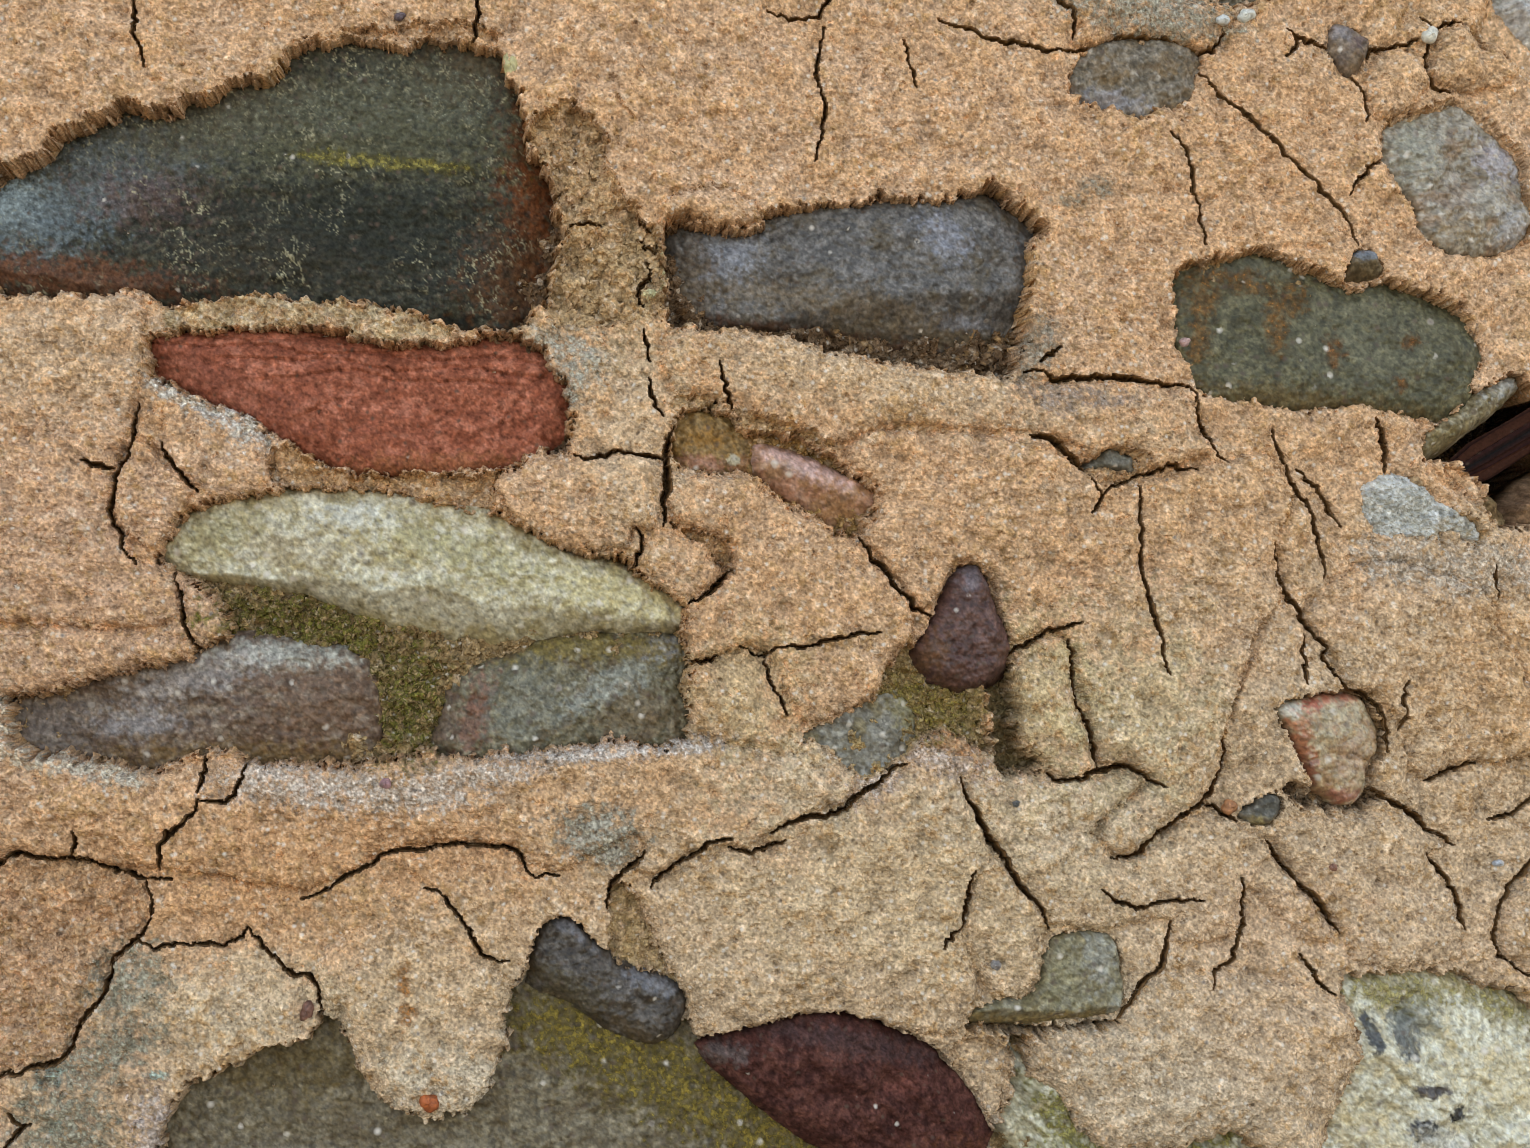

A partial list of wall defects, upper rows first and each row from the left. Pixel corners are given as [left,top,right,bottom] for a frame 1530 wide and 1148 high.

crack [938,0,1381,245]
spalling [161,292,454,342]
peeling [180,577,226,647]
peeling [113,403,735,599]
crack [1022,347,1227,675]
crack [1271,430,1410,752]
crack [0,752,322,1078]
crack [605,764,905,908]
crack [943,777,1050,949]
crack [1010,622,1340,1019]
crack [1368,760,1530,977]
peeling [949,1037,1011,1120]